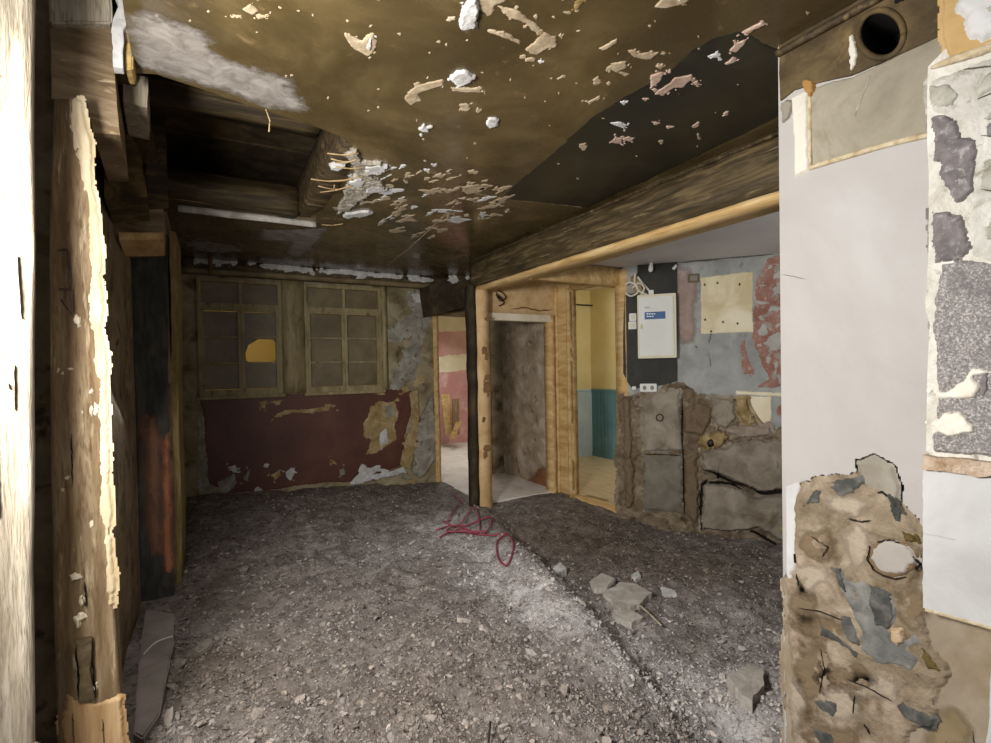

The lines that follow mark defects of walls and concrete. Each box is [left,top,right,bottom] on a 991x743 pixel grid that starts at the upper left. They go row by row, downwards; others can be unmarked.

damp [130,13,306,109]
peeling [344,33,377,59]
peeling [447,0,564,64]
peeling [581,48,702,104]
peeling [343,163,516,239]
flaking render [780,35,991,457]
peeling [193,258,436,495]
peeling [700,255,781,388]
rust [141,416,173,572]
crack [647,408,782,529]
spalling [614,382,991,743]
crack [866,539,922,580]